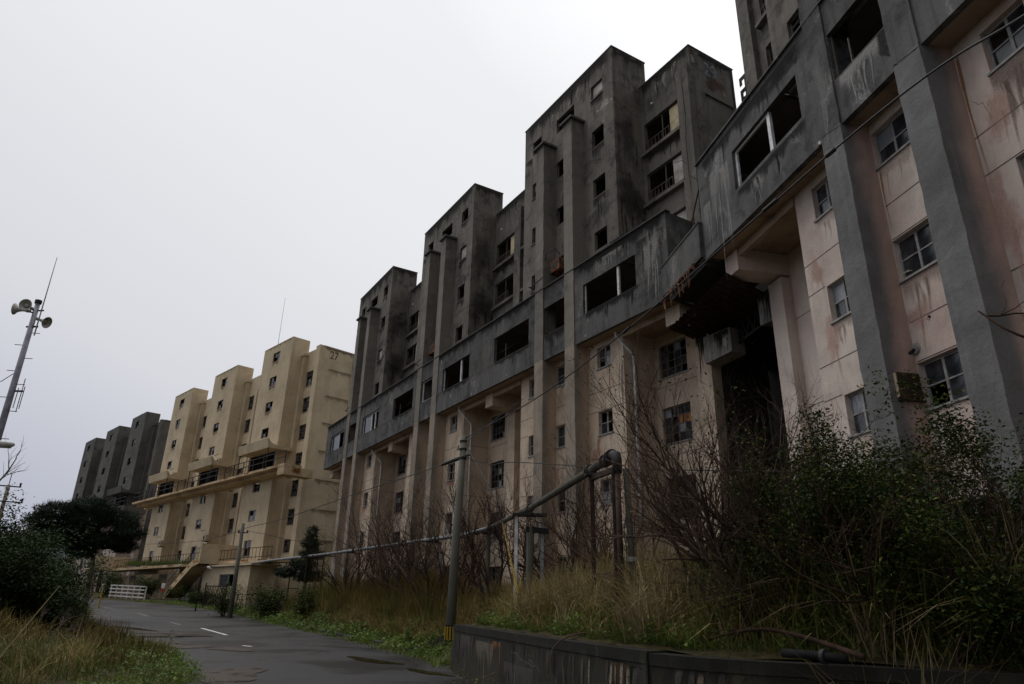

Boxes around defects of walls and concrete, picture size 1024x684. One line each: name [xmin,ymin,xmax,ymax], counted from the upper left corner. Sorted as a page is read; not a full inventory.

damp [840,27,890,97]
damp [739,120,804,194]
damp [579,176,662,318]